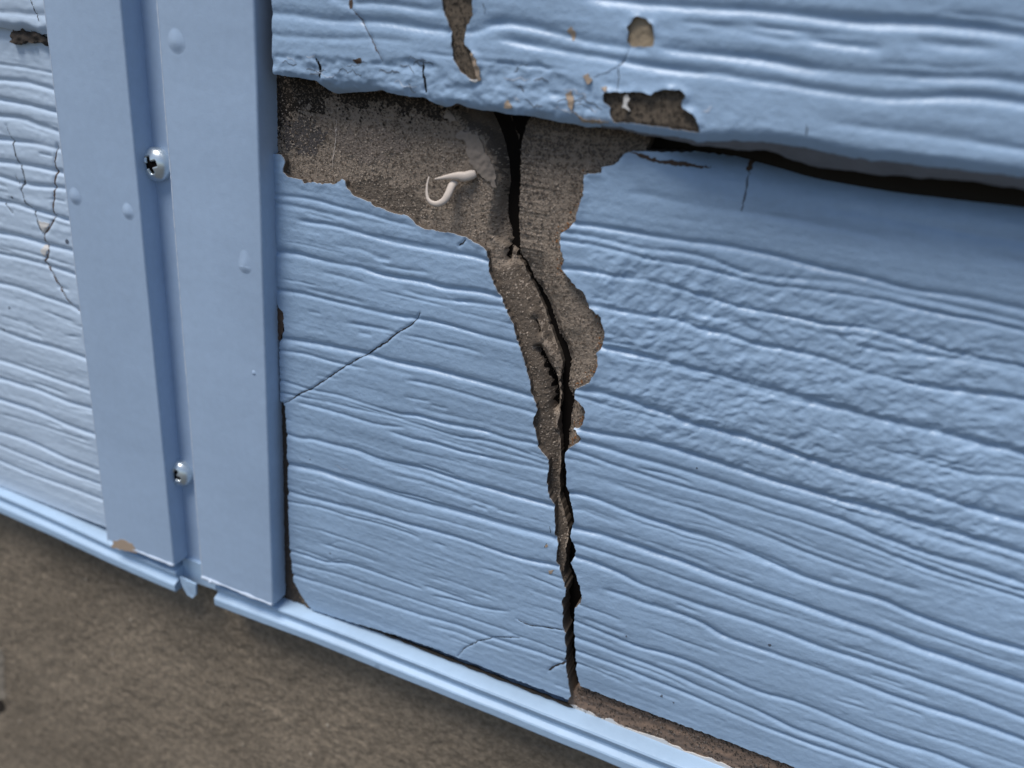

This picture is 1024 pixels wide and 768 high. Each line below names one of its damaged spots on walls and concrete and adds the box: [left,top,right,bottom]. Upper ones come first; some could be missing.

peeling [10,28,49,46]
peeling [444,0,481,83]
peeling [628,16,654,47]
crack [6,128,80,312]
crack [285,313,420,403]
spalling [278,56,711,570]
crack [461,111,582,683]
spalling [282,402,309,608]